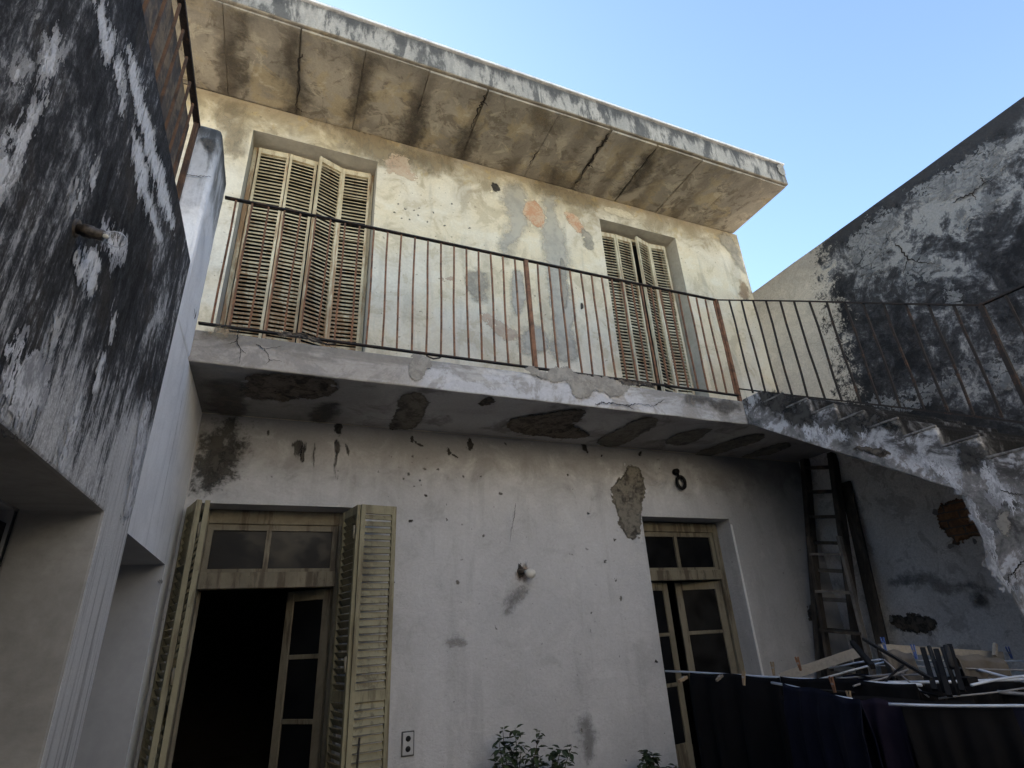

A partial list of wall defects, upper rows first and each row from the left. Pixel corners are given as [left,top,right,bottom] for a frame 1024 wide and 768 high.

crack [295,54,303,112]
water stain [334,97,475,174]
crack [470,95,488,129]
crack [575,133,610,183]
water stain [618,154,655,194]
flaking render [522,199,547,228]
crack [895,244,935,272]
crack [230,327,337,364]
water stain [190,381,249,494]
flaking render [610,451,648,543]
flaking render [918,453,1024,602]
flaking render [889,612,937,636]